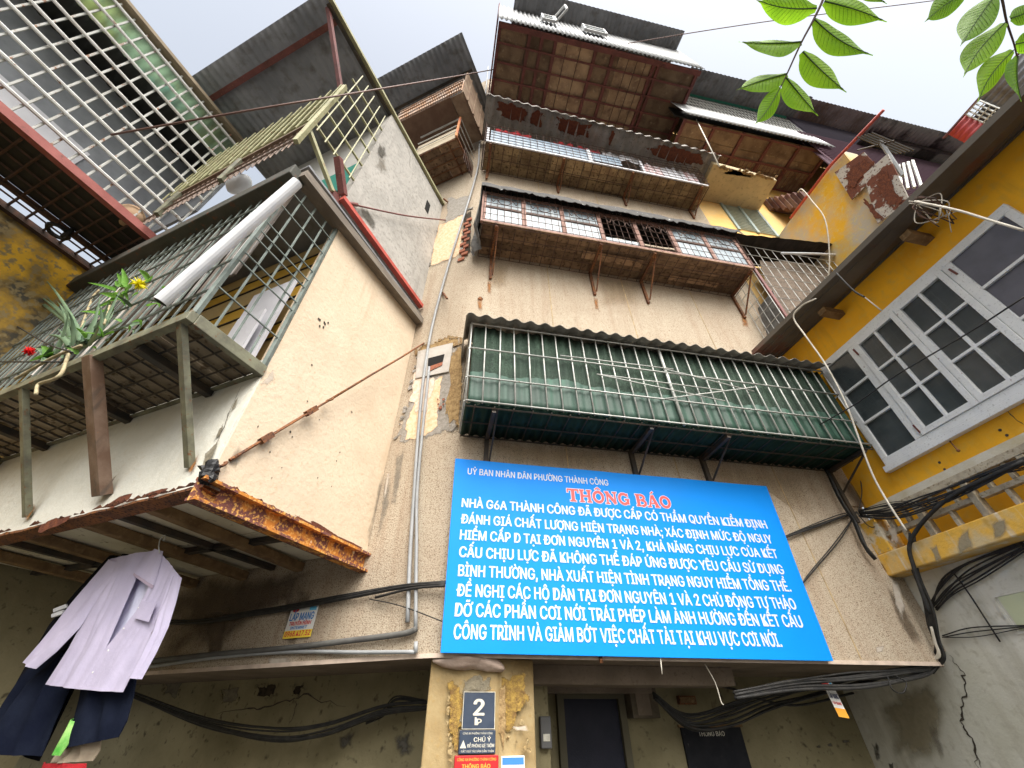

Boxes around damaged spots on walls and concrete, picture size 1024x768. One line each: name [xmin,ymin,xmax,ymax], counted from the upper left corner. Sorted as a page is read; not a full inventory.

flaking render [394,335,463,442]
peeling [446,672,532,765]
crack [951,656,981,768]